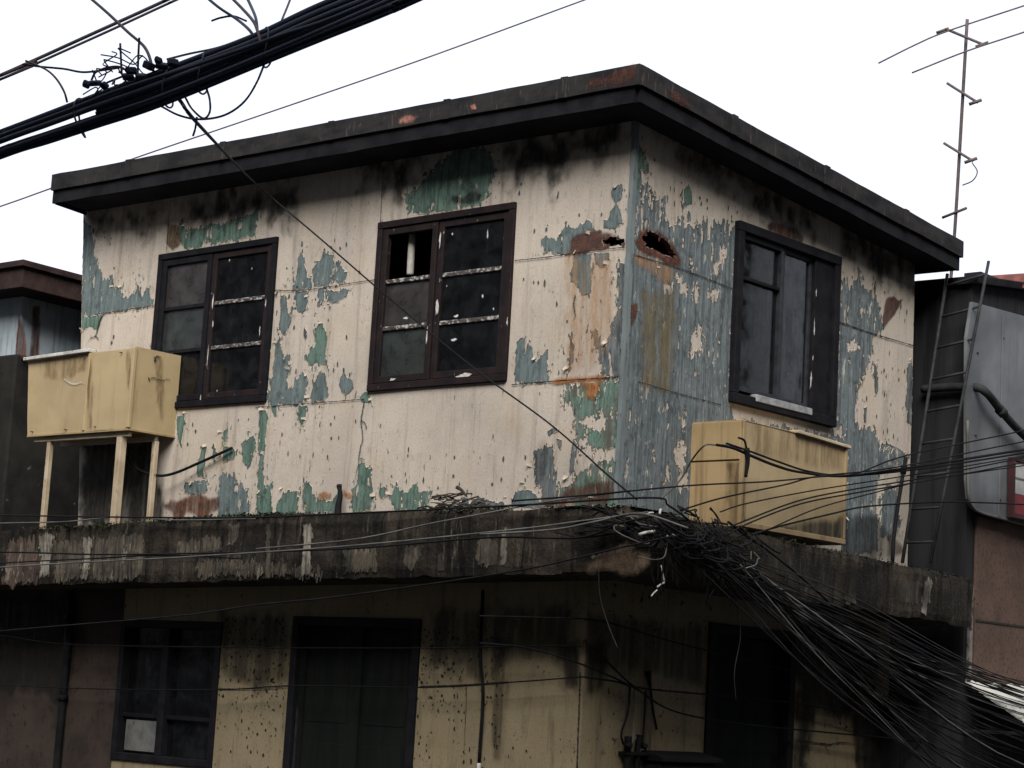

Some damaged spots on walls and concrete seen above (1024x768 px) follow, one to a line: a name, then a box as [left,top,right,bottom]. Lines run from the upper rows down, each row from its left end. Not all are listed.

damp [190,188,295,230]
peeling [401,145,500,218]
damp [452,193,481,203]
damp [504,123,618,183]
peeling [79,219,154,338]
rust [569,228,680,280]
rust [883,296,902,328]
peeling [452,137,913,555]
peeling [175,239,439,583]
rust [553,375,606,398]
damp [494,608,701,692]